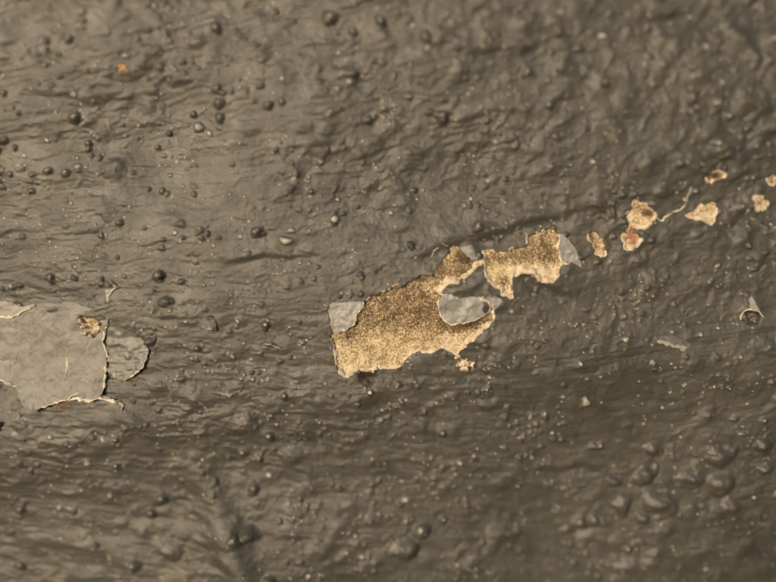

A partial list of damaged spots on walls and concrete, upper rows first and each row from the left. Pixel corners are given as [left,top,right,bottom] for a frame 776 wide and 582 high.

peeling [705,170,727,184]
peeling [621,199,657,251]
peeling [686,202,719,226]
peeling [752,195,770,212]
peeling [587,232,607,258]
peeling [328,228,581,378]
peeling [0,300,149,413]